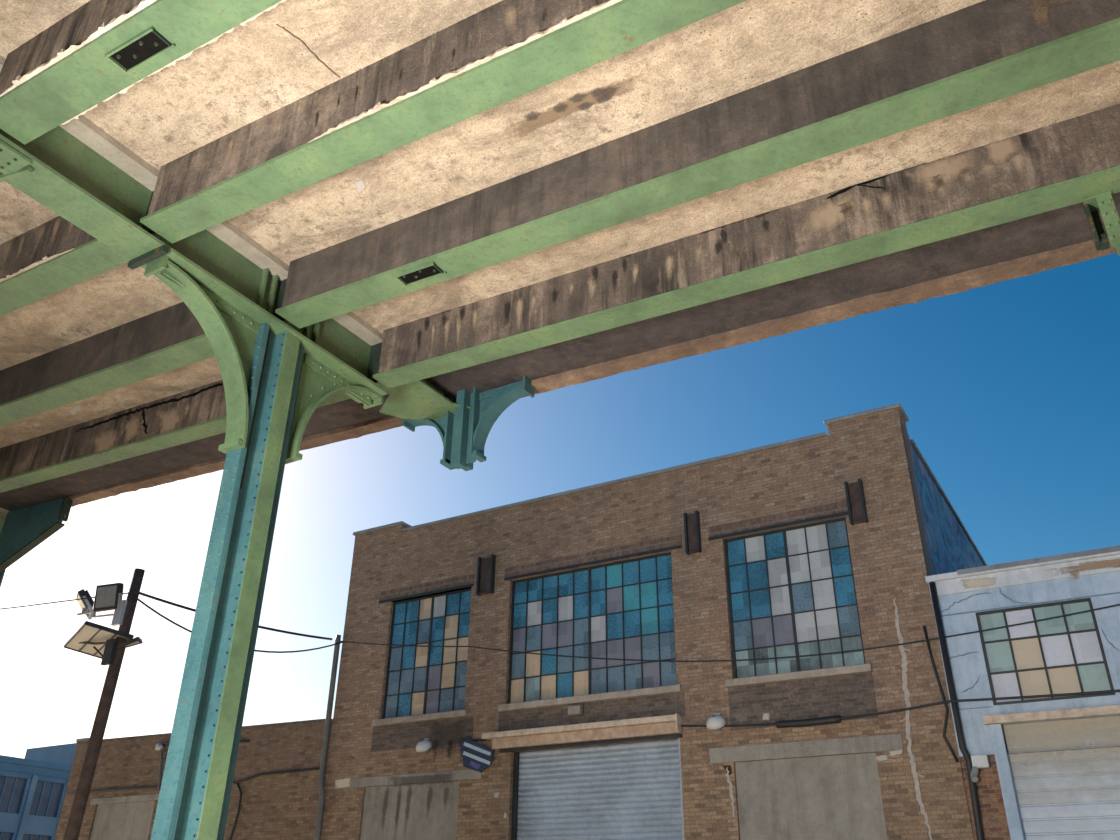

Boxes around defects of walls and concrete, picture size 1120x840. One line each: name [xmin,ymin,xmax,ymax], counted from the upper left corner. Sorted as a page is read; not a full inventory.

crack [276,24,340,78]
crack [941,587,1027,613]
crack [894,598,932,840]